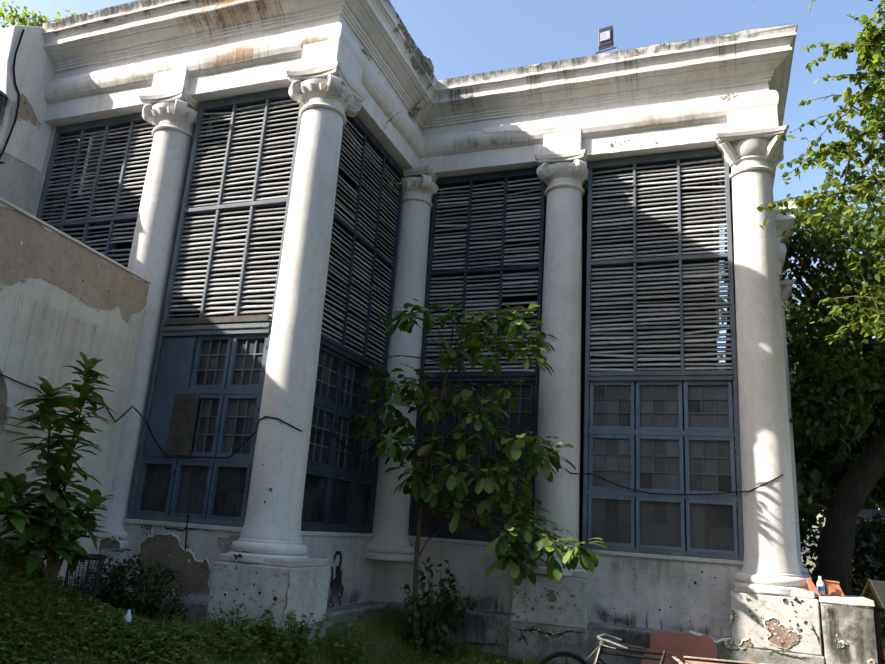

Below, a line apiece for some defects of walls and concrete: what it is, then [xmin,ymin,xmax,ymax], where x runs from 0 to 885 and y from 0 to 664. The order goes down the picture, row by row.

corrosion [190,0,265,27]
leakage [438,56,593,103]
peeling [13,93,41,129]
peeling [0,206,149,322]
spalling [99,524,261,619]
crack [462,626,584,646]
spalling [705,578,821,651]
leakage [826,620,860,662]